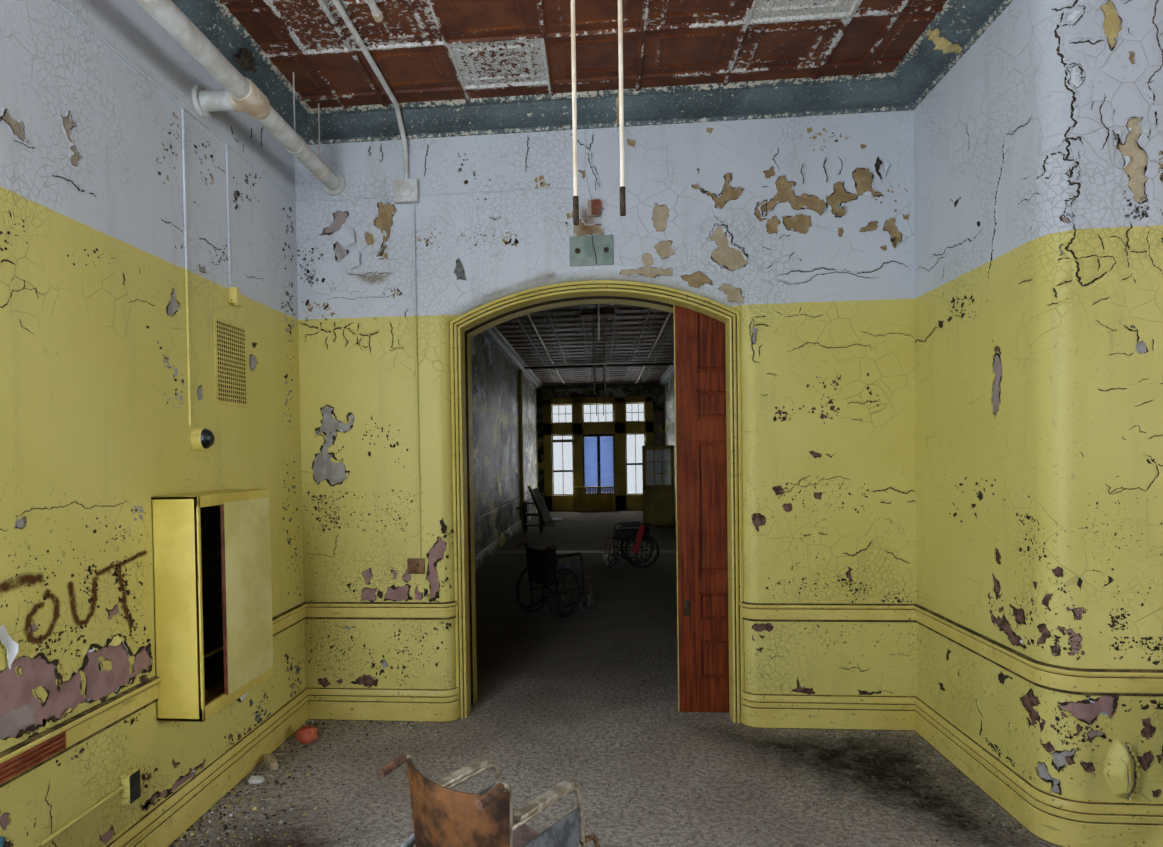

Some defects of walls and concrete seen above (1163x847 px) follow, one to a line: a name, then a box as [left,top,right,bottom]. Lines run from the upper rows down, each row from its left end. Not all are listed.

peeling [927,28,962,54]
peeling [618,168,750,305]
peeling [753,156,910,251]
crack [707,0,1163,495]
peeling [1112,115,1163,220]
peeling [281,200,398,428]
peeling [282,404,414,572]
crack [778,475,916,506]
peeling [342,518,454,603]
crack [803,530,911,564]
peeling [0,505,154,745]
peeling [1019,686,1163,796]